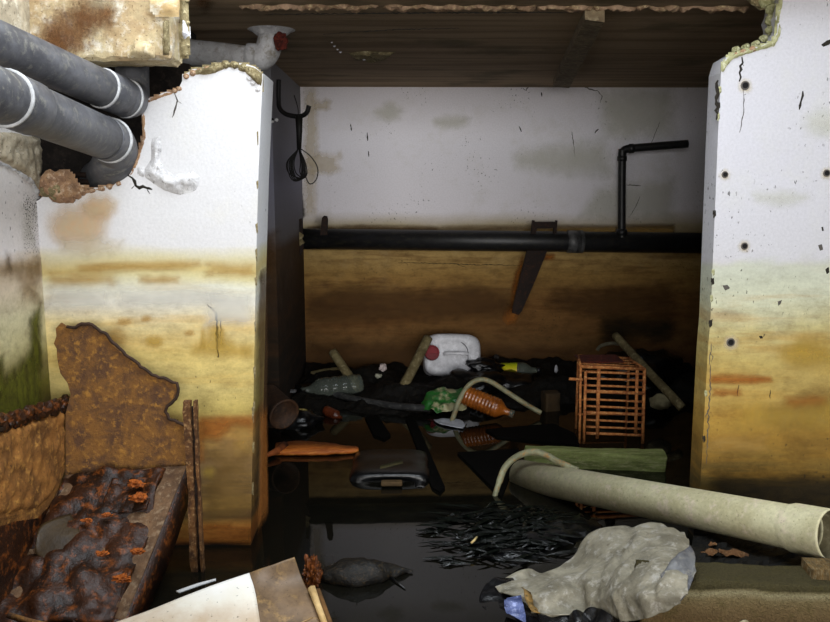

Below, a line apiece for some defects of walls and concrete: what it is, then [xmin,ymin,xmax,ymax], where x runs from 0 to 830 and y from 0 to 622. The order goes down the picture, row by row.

rust [43,0,115,54]
spalling [128,0,264,102]
spalling [714,0,783,121]
crack [738,57,746,130]
peeling [0,132,121,204]
crack [128,175,152,194]
water stain [31,308,42,369]
crack [207,304,222,357]
water stain [259,238,273,524]
water stain [712,376,770,396]
water stain [714,475,830,508]